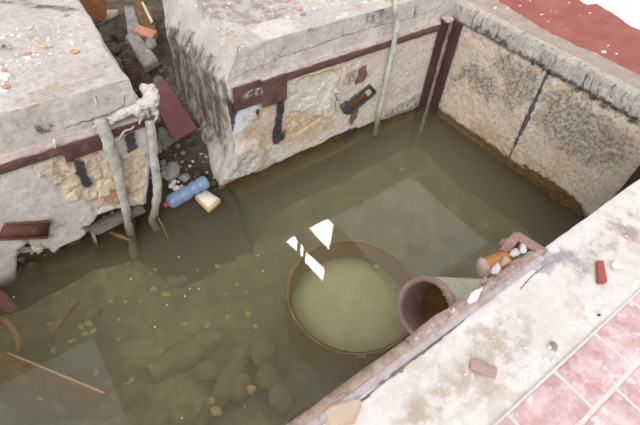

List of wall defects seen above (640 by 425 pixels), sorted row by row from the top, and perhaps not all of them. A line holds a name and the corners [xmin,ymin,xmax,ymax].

spalling [16,152,121,269]
spalling [119,149,146,205]
water stain [164,22,228,149]
peeling [233,105,260,136]
corrosion [348,65,367,85]
water stain [436,109,583,217]
crack [509,50,550,159]